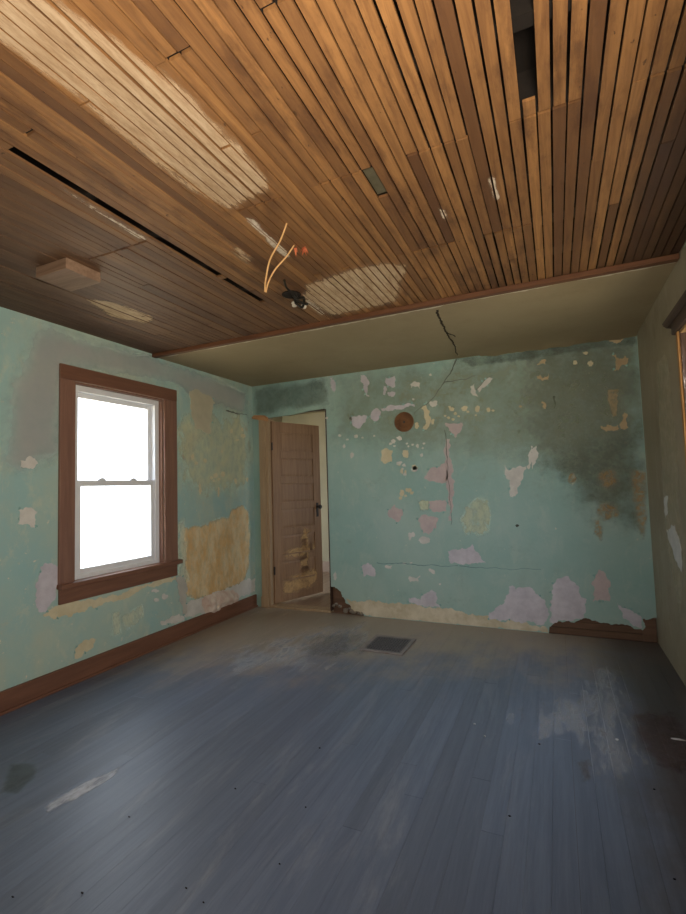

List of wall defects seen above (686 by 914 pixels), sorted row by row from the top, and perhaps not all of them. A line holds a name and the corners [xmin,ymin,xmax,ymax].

leakage [0,0,268,208]
crack [414,310,493,414]
peeling [338,374,495,544]
peeling [503,446,539,497]
leakage [528,348,636,519]
peeling [448,544,486,567]
flaking render [332,570,658,643]
peeling [664,496,682,572]